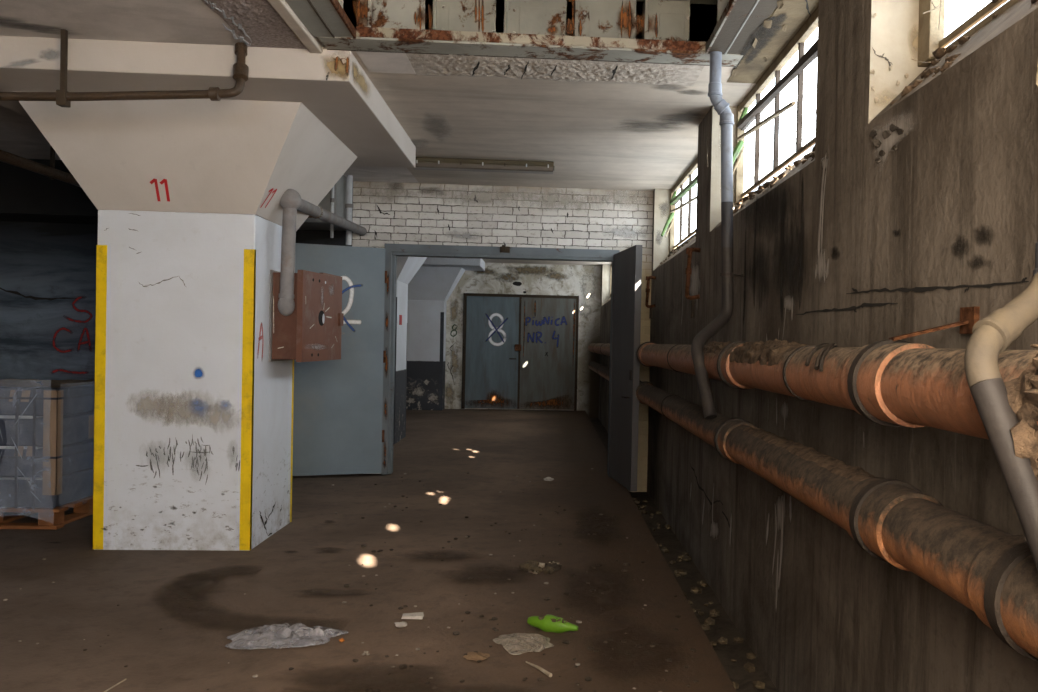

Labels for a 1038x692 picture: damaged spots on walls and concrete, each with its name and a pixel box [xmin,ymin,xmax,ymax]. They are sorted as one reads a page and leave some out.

rust [354,0,373,25]
rust [414,4,432,30]
rust [474,0,484,32]
rust [547,0,582,36]
rust [618,0,658,38]
rust [326,56,368,93]
peeling [869,115,910,163]
crack [0,288,75,300]
crack [796,277,1029,315]
rust [469,392,512,407]